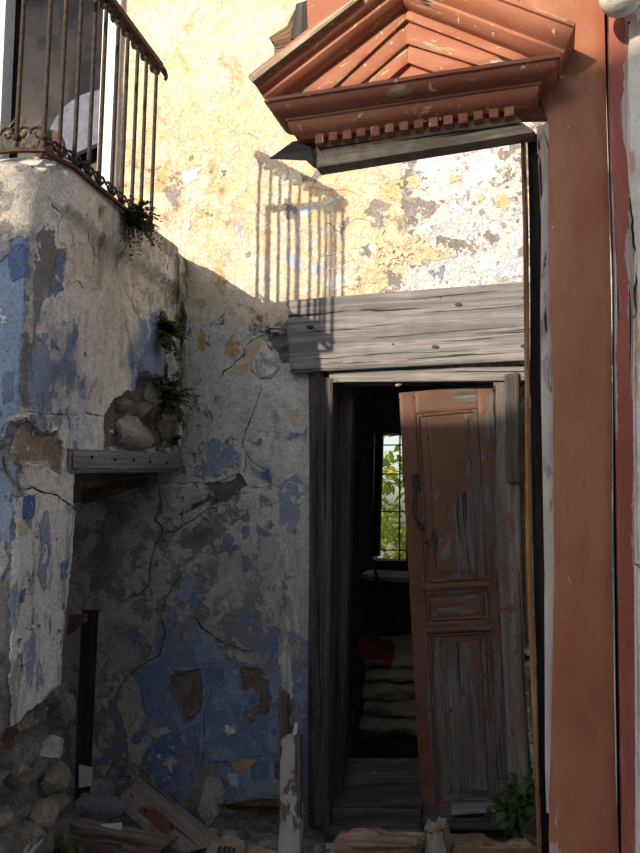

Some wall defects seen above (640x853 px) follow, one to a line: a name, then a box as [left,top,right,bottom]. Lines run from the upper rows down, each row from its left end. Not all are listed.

peeling [0,219,69,588]
spalling [101,247,251,510]
peeling [161,167,202,214]
flaking render [220,328,290,377]
peeling [263,193,334,222]
peeling [280,240,360,294]
peeling [336,142,530,291]
crack [112,325,307,700]
flaking render [218,551,303,726]
flaking render [519,383,538,779]
flaking render [0,643,67,827]
peeling [198,751,280,828]